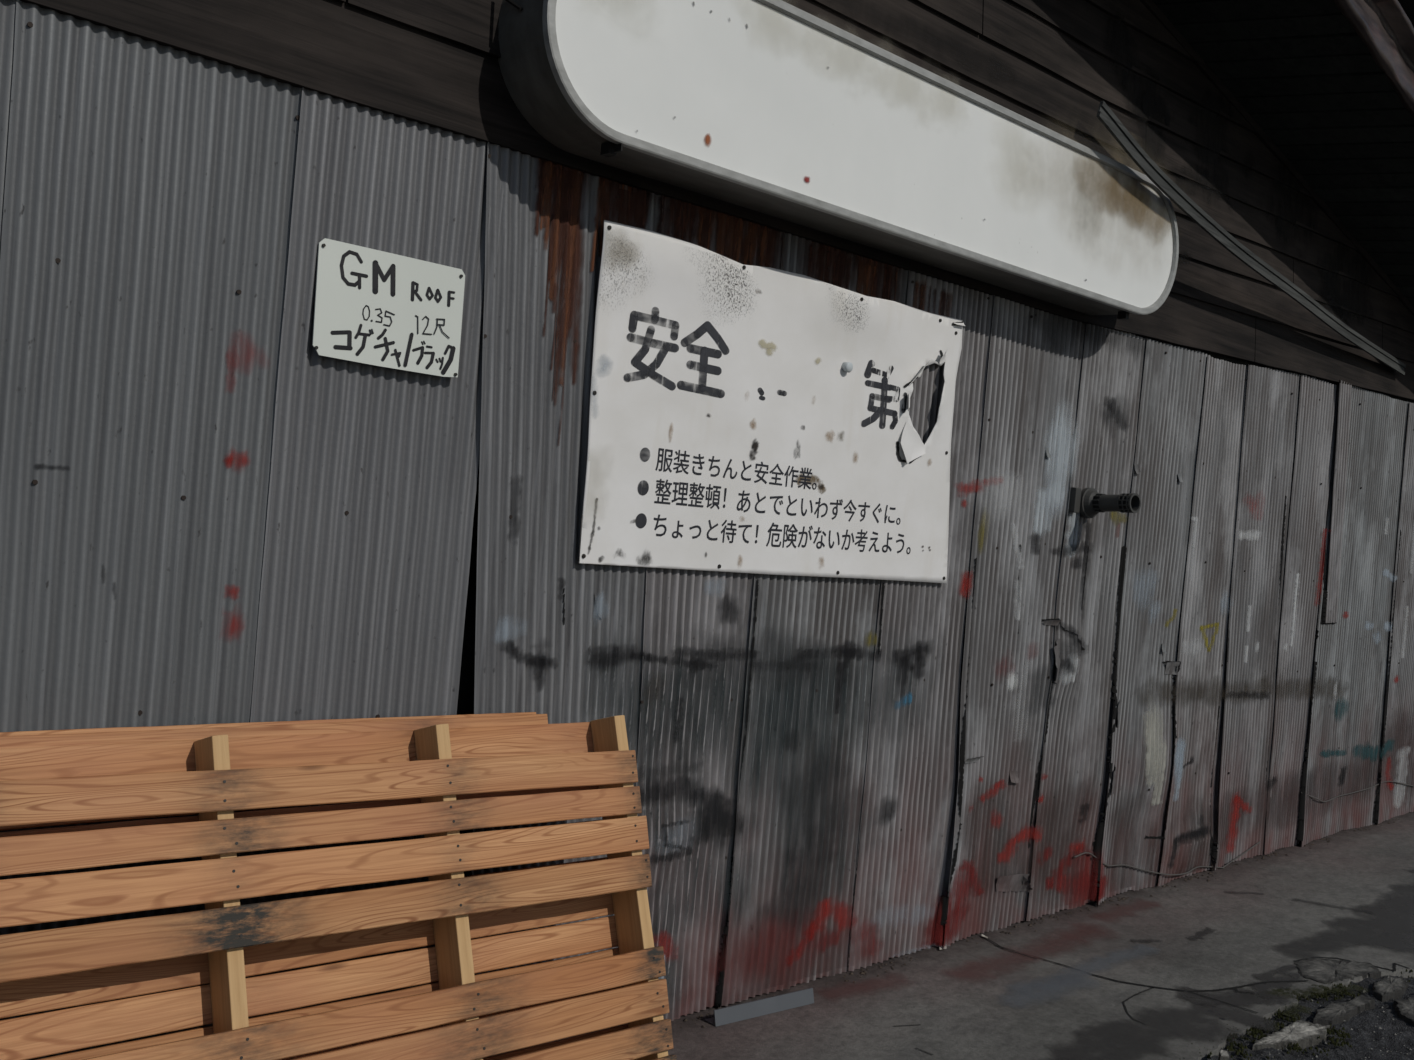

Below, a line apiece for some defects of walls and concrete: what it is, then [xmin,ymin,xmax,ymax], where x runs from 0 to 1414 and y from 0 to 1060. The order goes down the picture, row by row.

corrosion [535,158,781,445]
corrosion [808,240,901,301]
corrosion [914,282,953,317]